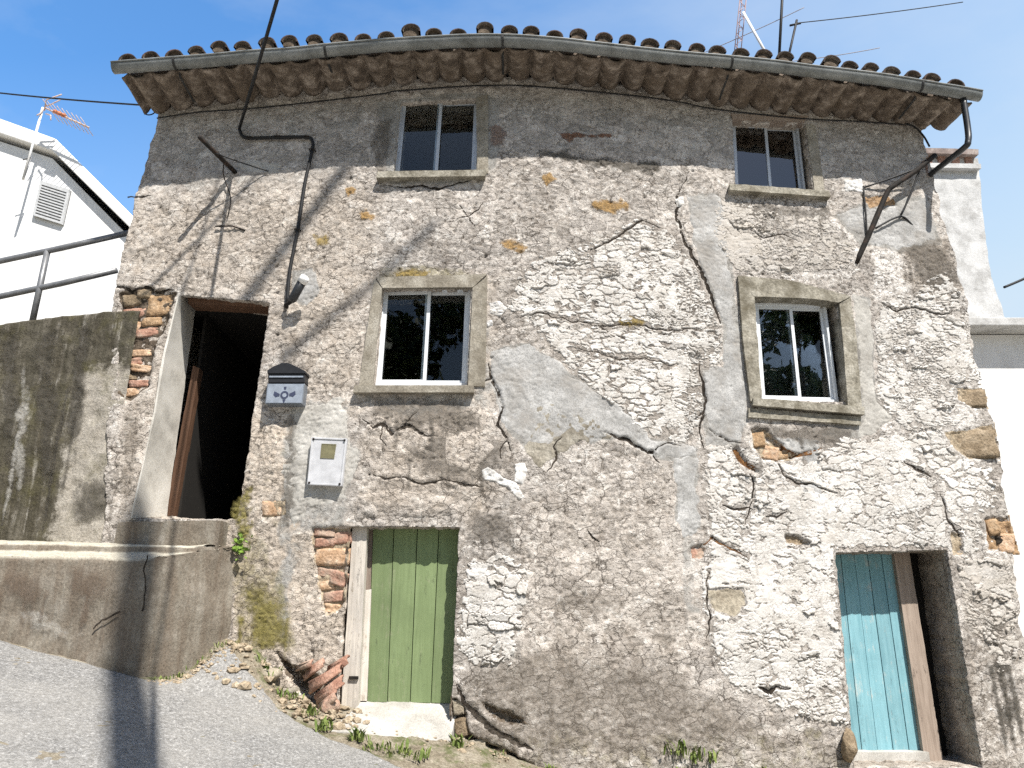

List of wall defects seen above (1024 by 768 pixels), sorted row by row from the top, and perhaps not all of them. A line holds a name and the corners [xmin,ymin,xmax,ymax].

crack [522,172,721,366]
flaking render [117,289,176,401]
peeling [506,216,723,447]
leakage [2,327,88,516]
leakage [76,484,107,521]
crack [363,413,437,447]
crack [368,474,488,489]
crack [778,448,838,494]
peeling [691,273,1022,726]
crack [93,555,148,629]
flaking render [311,528,352,616]
peeling [456,553,528,666]